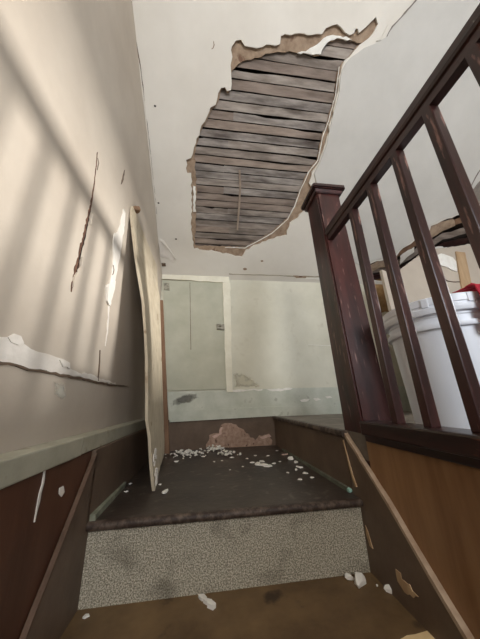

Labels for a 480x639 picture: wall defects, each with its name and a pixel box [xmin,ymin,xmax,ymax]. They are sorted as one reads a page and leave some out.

flaking render [186,18,376,256]
crack [71,152,99,292]
peeling [105,209,126,346]
flaking render [397,241,418,269]
flaking render [430,217,469,272]
peeling [0,334,116,384]
leakage [177,395,196,404]
peeling [206,423,272,455]
peeling [395,569,419,598]